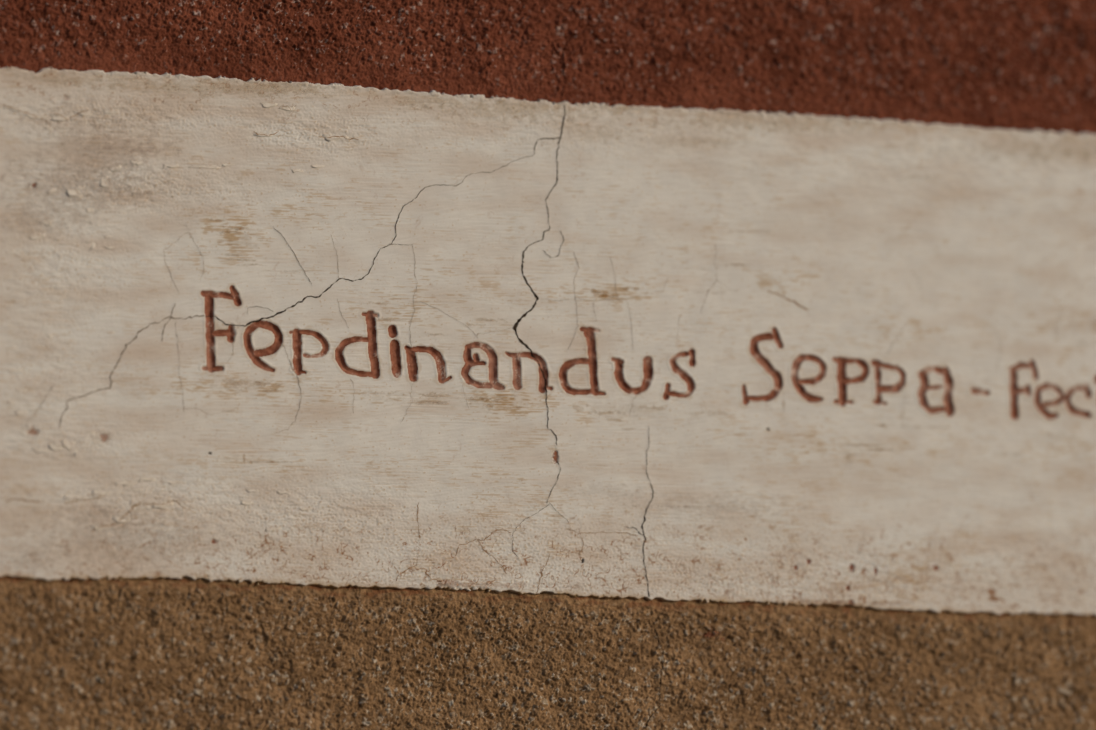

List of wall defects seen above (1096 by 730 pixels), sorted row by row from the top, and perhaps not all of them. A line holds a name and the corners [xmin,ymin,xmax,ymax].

crack [26,0,668,727]